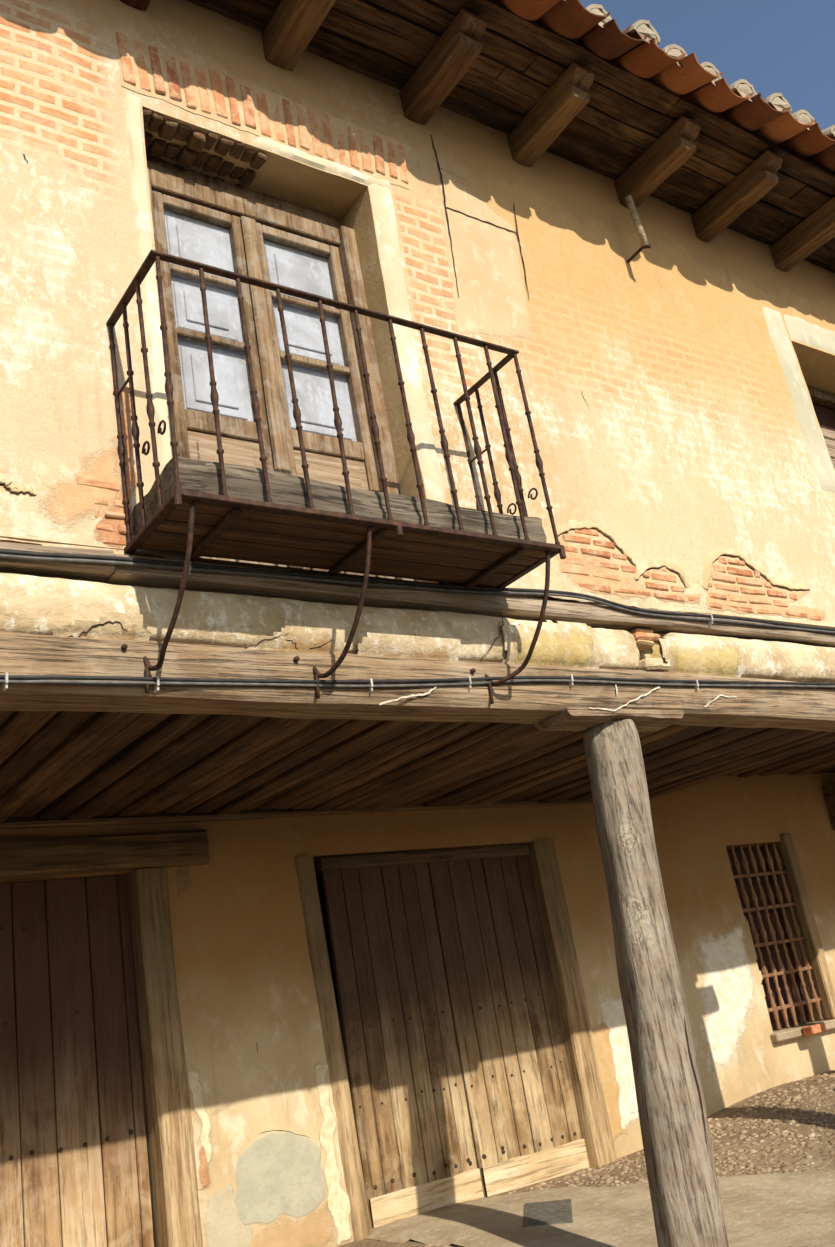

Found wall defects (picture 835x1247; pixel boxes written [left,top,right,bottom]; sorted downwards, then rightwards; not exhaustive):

crack [0,474,37,496]
flaking render [75,474,120,491]
flaking render [556,518,827,623]
peeling [590,987,640,1132]
flaking render [186,1065,215,1190]
flaking render [310,1059,354,1247]